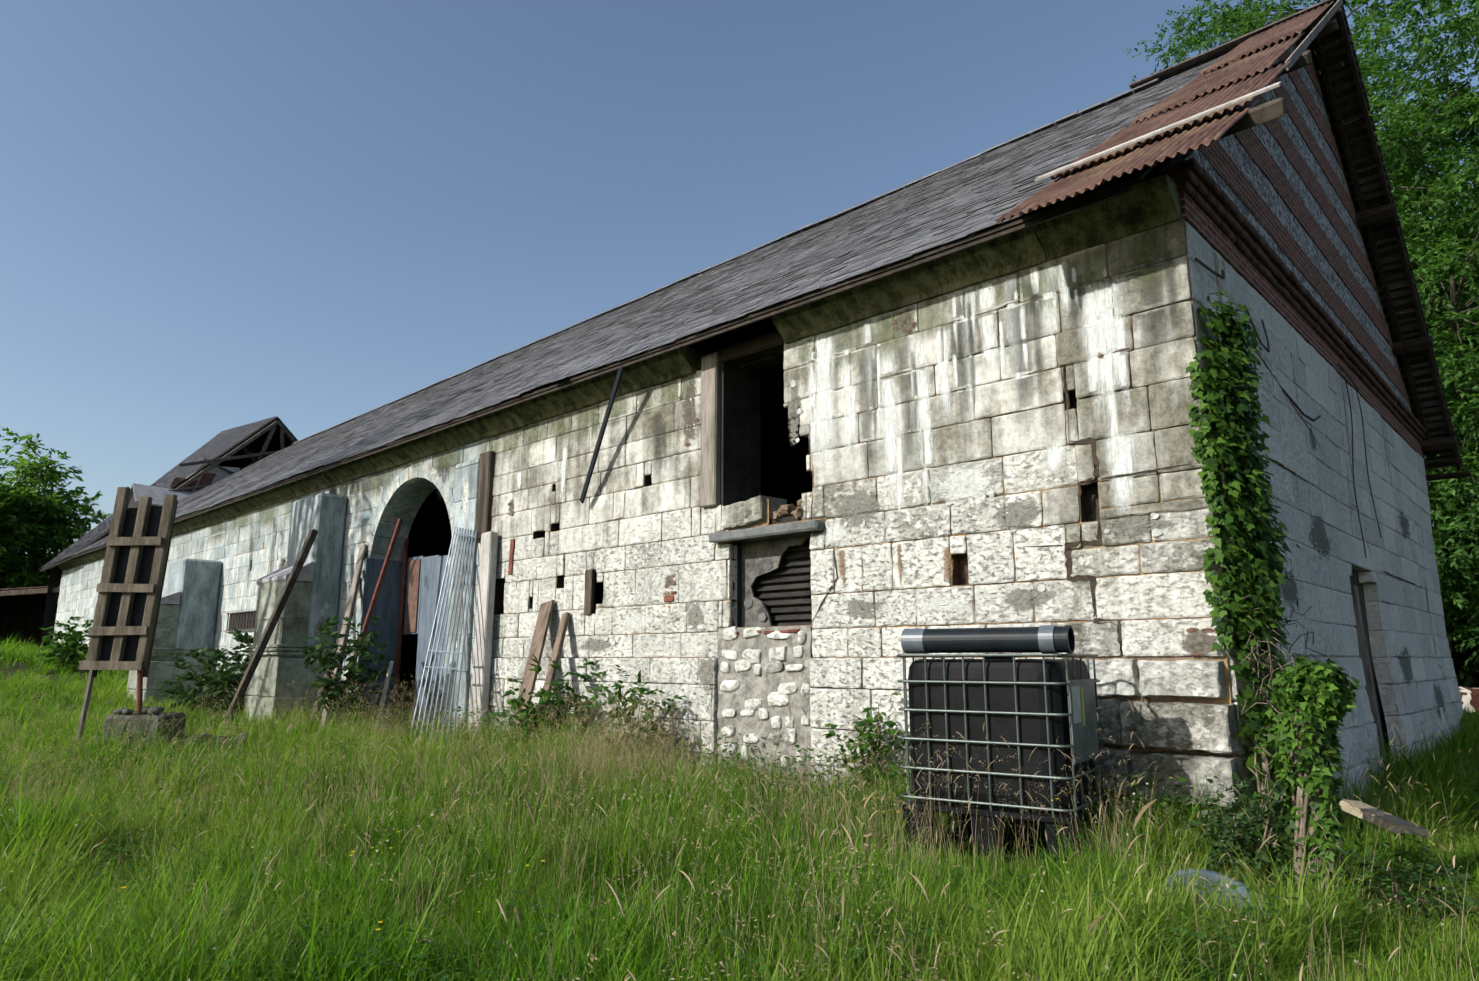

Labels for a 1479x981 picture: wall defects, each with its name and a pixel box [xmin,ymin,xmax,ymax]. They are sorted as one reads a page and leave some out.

spalling [788,380,802,444]
leakage [802,250,1134,509]
flaking render [742,489,882,627]